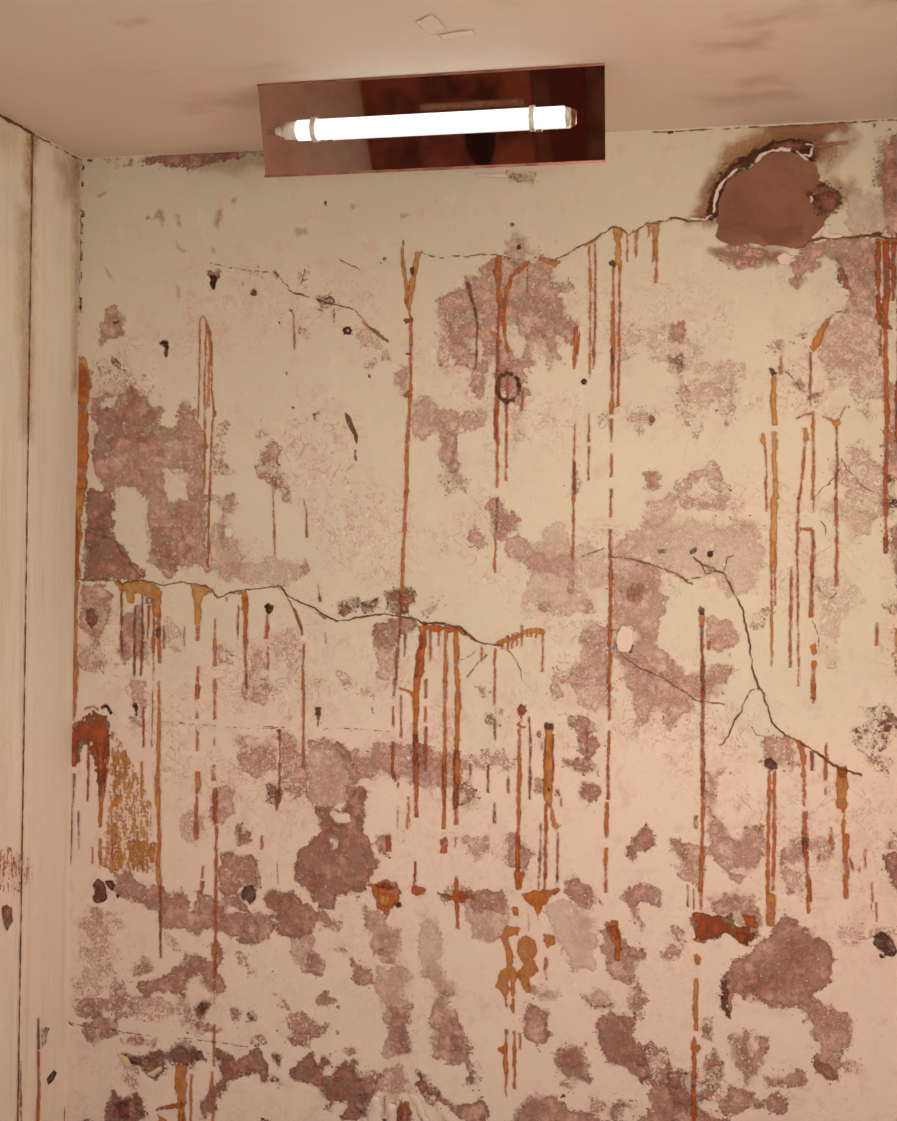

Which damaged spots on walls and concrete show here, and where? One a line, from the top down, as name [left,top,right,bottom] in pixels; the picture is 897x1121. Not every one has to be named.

crack [211,263,388,342]
crack [551,213,708,261]
rust [70,356,165,959]
peeling [77,304,310,737]
crack [75,529,522,678]
rust [391,242,545,853]
peeling [467,461,765,813]
crack [581,548,862,776]
peeling [73,707,522,1121]
rust [495,704,562,1013]
peeling [513,768,897,1121]
rust [687,606,778,1121]